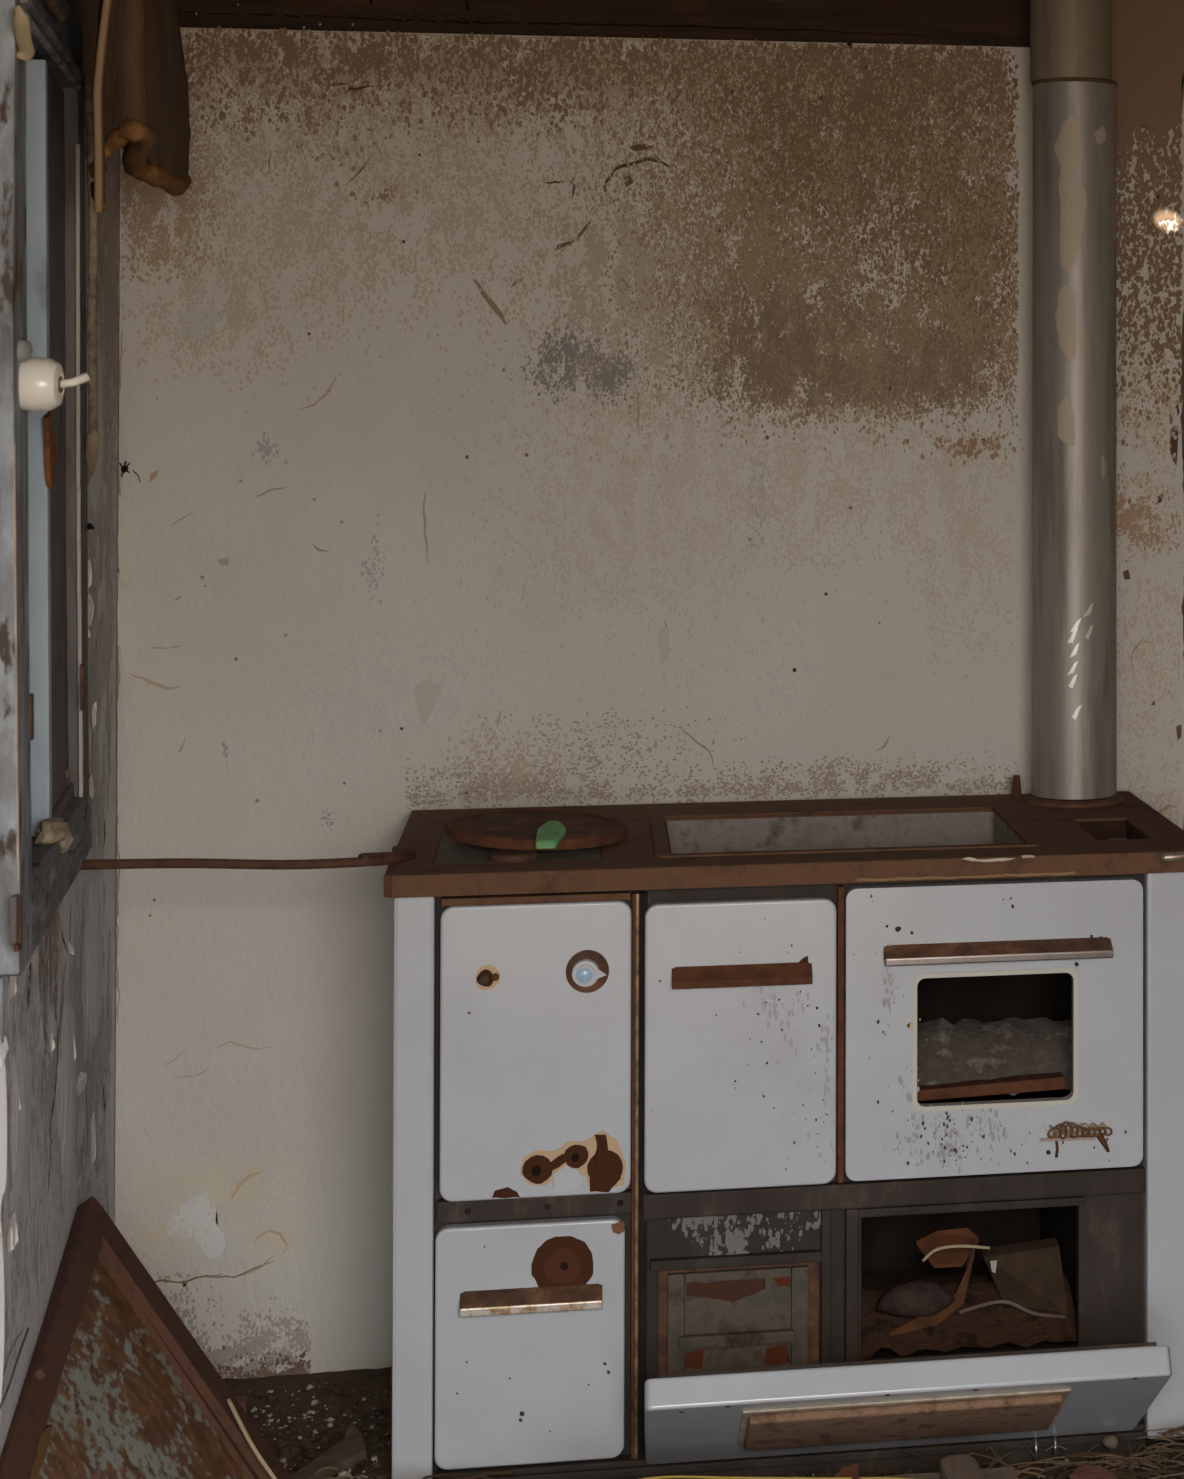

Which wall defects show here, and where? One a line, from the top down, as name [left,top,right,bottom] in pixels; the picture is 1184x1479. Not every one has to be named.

leakage [1,38,1019,1412]
flaking render [1169,405,1179,466]